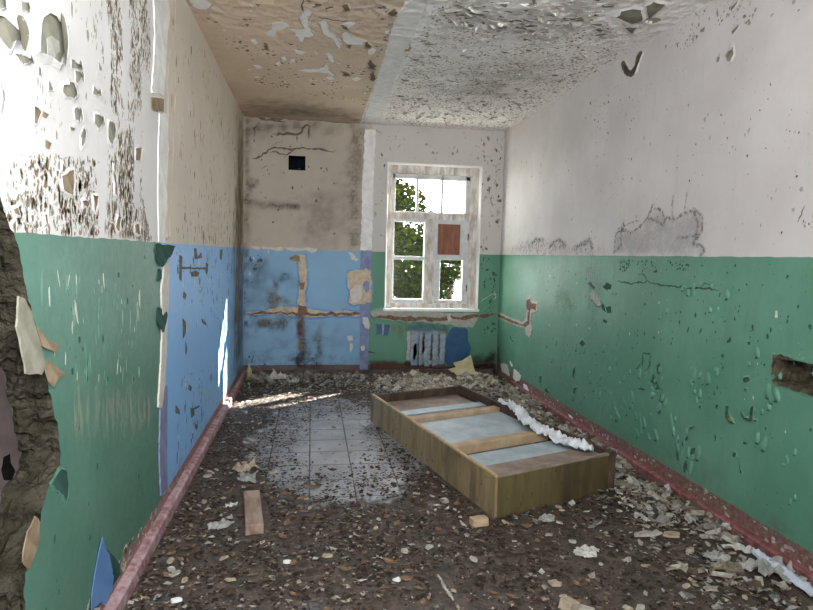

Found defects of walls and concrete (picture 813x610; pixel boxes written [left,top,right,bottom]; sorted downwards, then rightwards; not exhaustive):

peeling [665,0,757,64]
crack [252,117,348,169]
peeling [223,0,670,367]
leakage [614,194,705,256]
spalling [0,0,241,610]
spalling [565,265,689,361]
crack [619,273,719,291]
spalling [698,349,813,439]